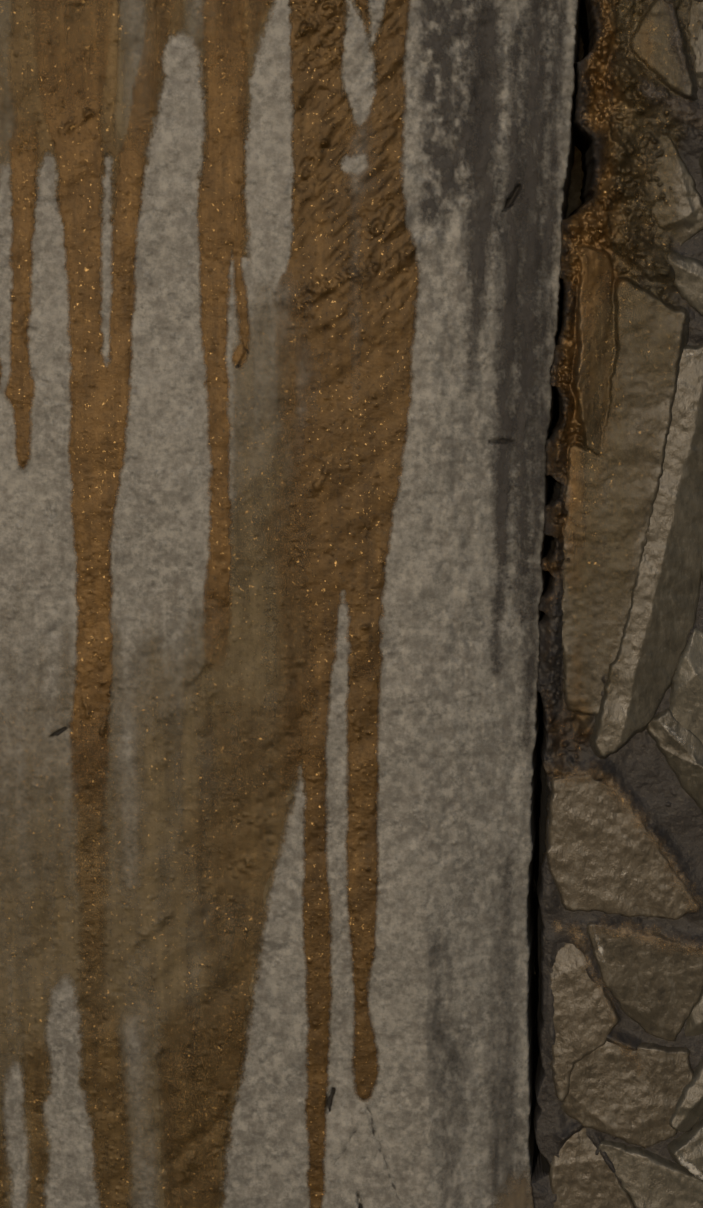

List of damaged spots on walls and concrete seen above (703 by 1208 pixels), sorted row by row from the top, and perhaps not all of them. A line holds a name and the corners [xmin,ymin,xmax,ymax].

crack [569,0,595,217]
crack [556,283,564,337]
crack [548,387,562,437]
crack [547,476,561,503]
crack [541,535,555,618]
crack [532,695,549,1175]